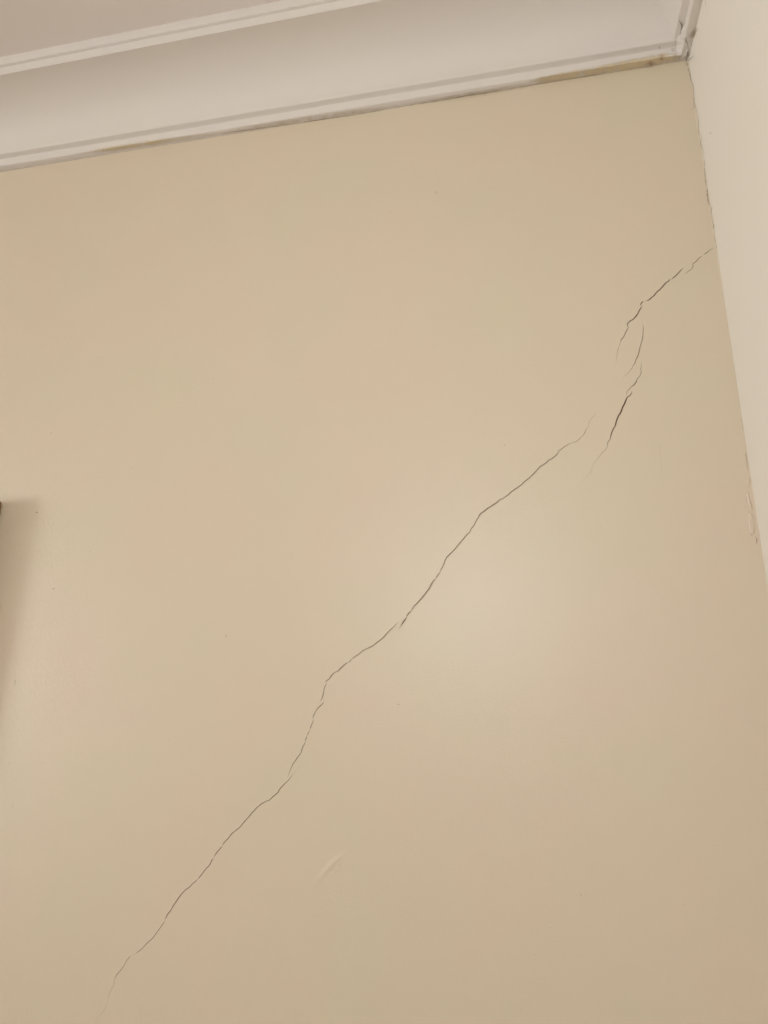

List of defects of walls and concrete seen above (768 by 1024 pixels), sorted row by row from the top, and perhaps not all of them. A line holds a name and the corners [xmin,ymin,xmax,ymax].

crack [580,15,717,484]
crack [93,412,597,1024]